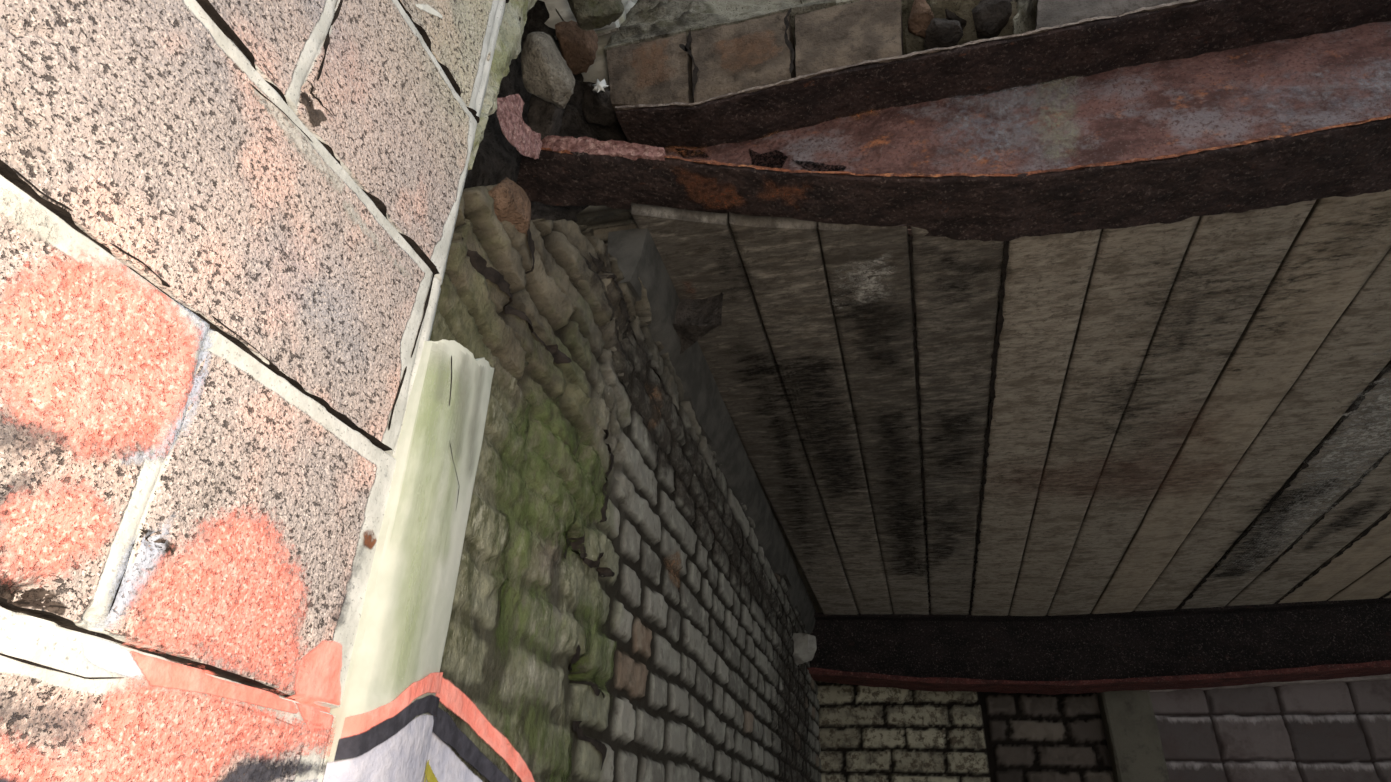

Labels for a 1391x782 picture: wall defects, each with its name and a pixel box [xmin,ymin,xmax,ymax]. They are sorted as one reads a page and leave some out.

leakage [734,351,975,577]
crack [0,529,295,727]